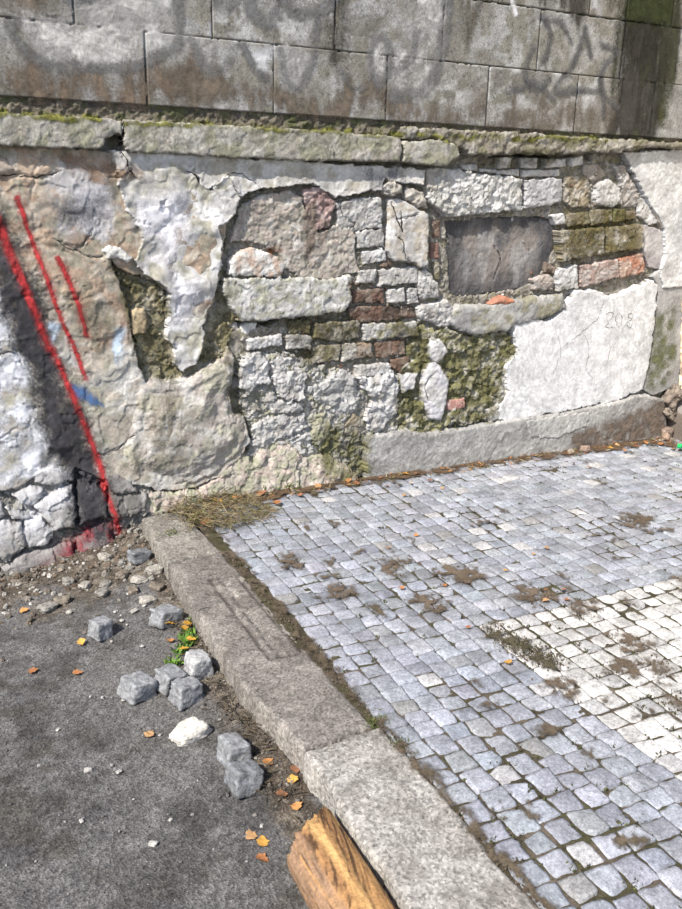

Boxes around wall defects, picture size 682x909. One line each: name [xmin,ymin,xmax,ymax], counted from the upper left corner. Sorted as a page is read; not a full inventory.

water stain [6,48,486,129]
water stain [330,0,345,63]
water stain [488,0,681,141]
crack [116,119,138,179]
flaking render [0,153,664,577]